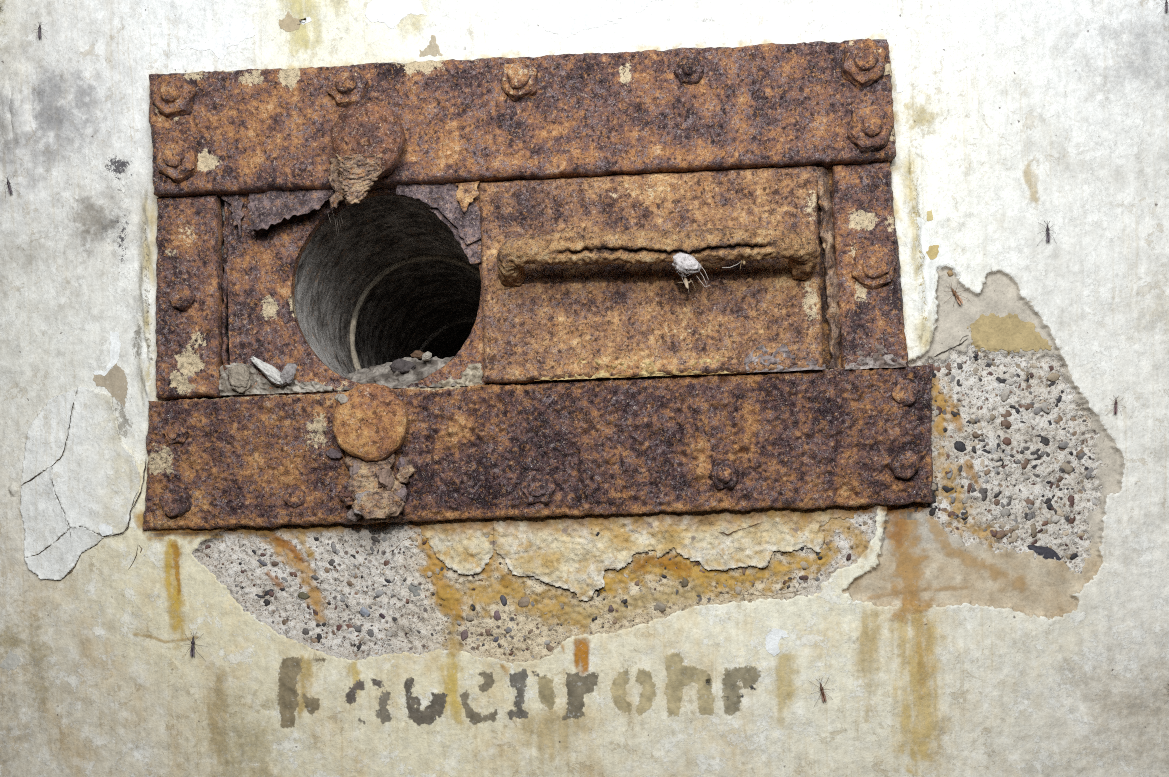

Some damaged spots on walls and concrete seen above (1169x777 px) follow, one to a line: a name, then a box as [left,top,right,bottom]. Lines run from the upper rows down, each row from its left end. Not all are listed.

rust [221,158,348,386]
rust [386,168,481,264]
rust [813,167,841,368]
peeling [20,331,140,580]
crack [22,392,146,579]
rust [137,448,416,630]
rust [412,523,592,719]
spalling [192,209,1125,664]
rust [600,520,866,615]
rust [848,502,935,772]
rust [931,378,961,435]
rust [940,453,990,537]